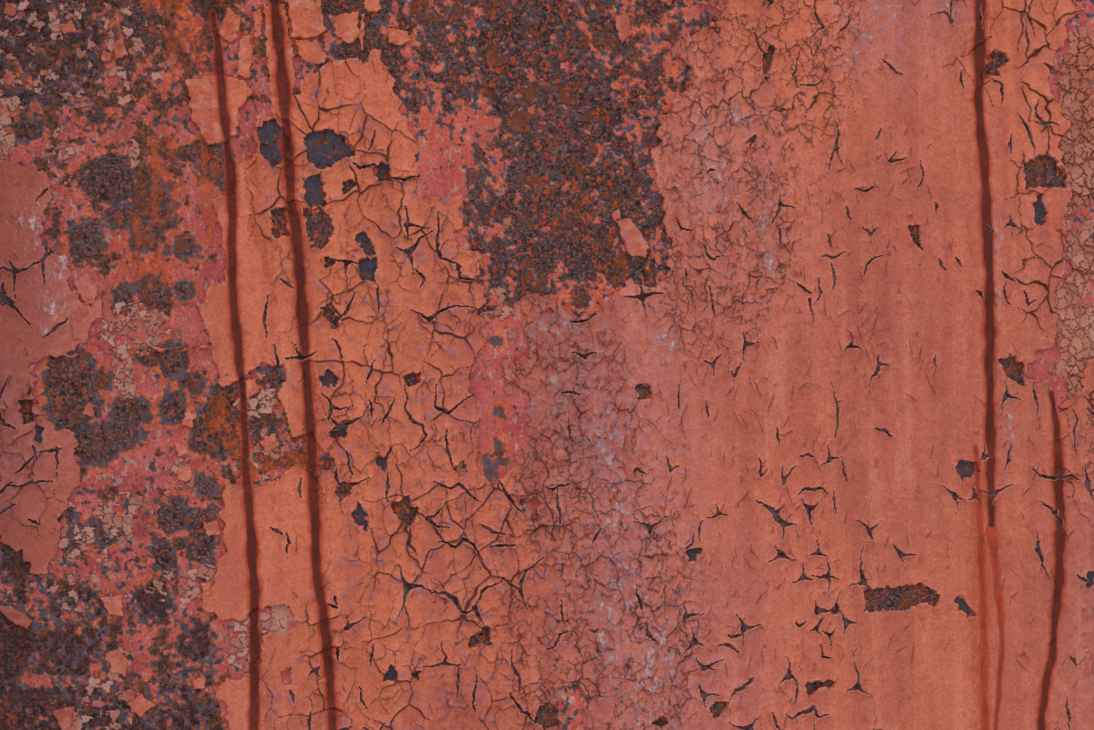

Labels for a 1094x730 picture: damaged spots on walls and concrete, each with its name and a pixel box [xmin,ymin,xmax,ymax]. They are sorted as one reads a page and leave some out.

rust [0,536,222,730]
rust [132,0,337,730]
crack [262,258,379,377]
peeling [0,0,721,730]
crack [354,131,484,322]
crack [321,361,542,630]
rust [321,0,718,317]
spalling [805,679,834,696]
crack [758,391,916,693]
spalling [863,582,939,613]
rust [972,0,1004,730]
peeling [998,0,1094,413]